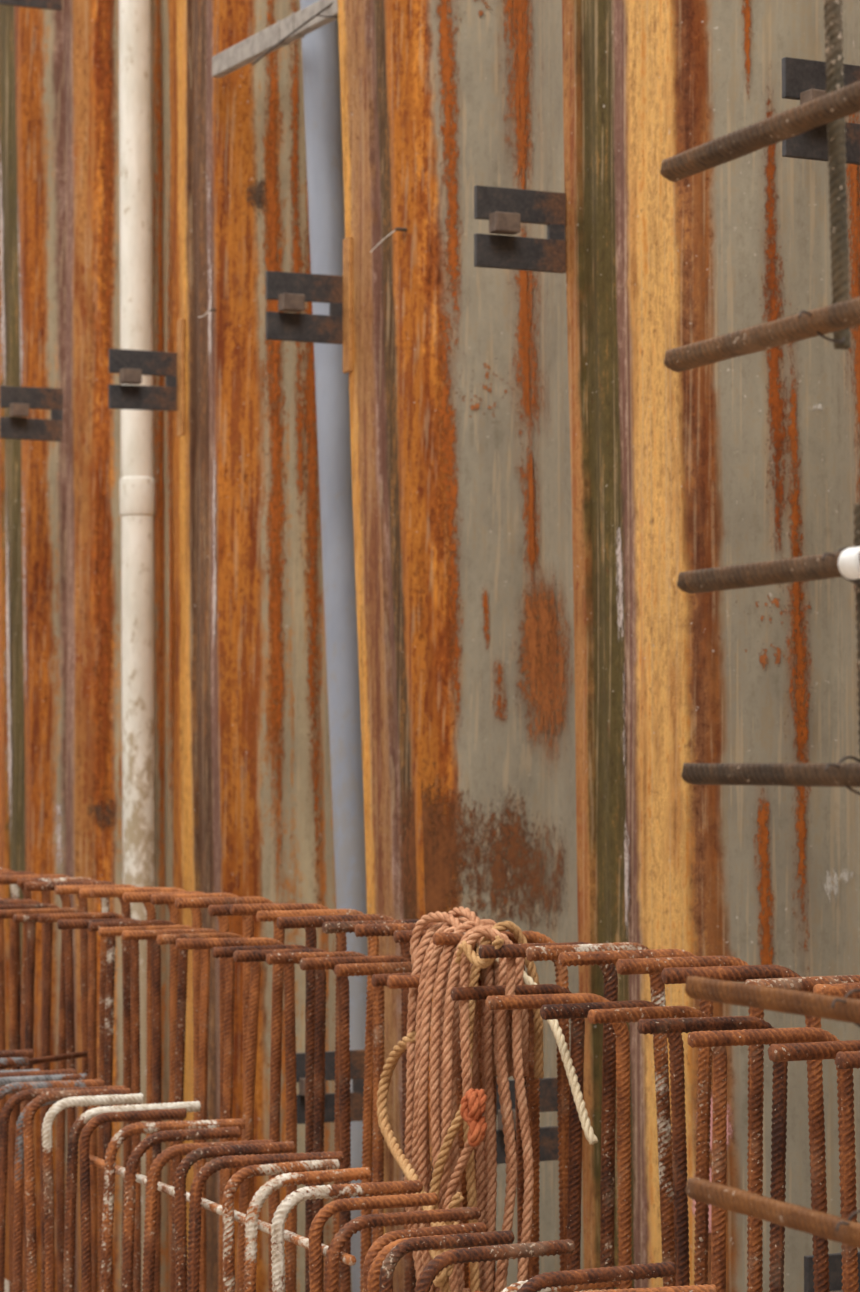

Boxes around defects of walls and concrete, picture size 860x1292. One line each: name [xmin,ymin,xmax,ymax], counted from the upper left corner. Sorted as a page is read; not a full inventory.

rust [96,0,116,351]
rust [260,40,311,274]
rust [758,143,791,322]
rust [846,164,860,299]
rust [434,0,573,774]
rust [764,343,803,558]
rust [845,325,860,503]
rust [94,479,113,841]
rust [262,335,321,901]
rust [736,582,812,763]
rust [754,788,774,965]
rust [792,786,811,951]